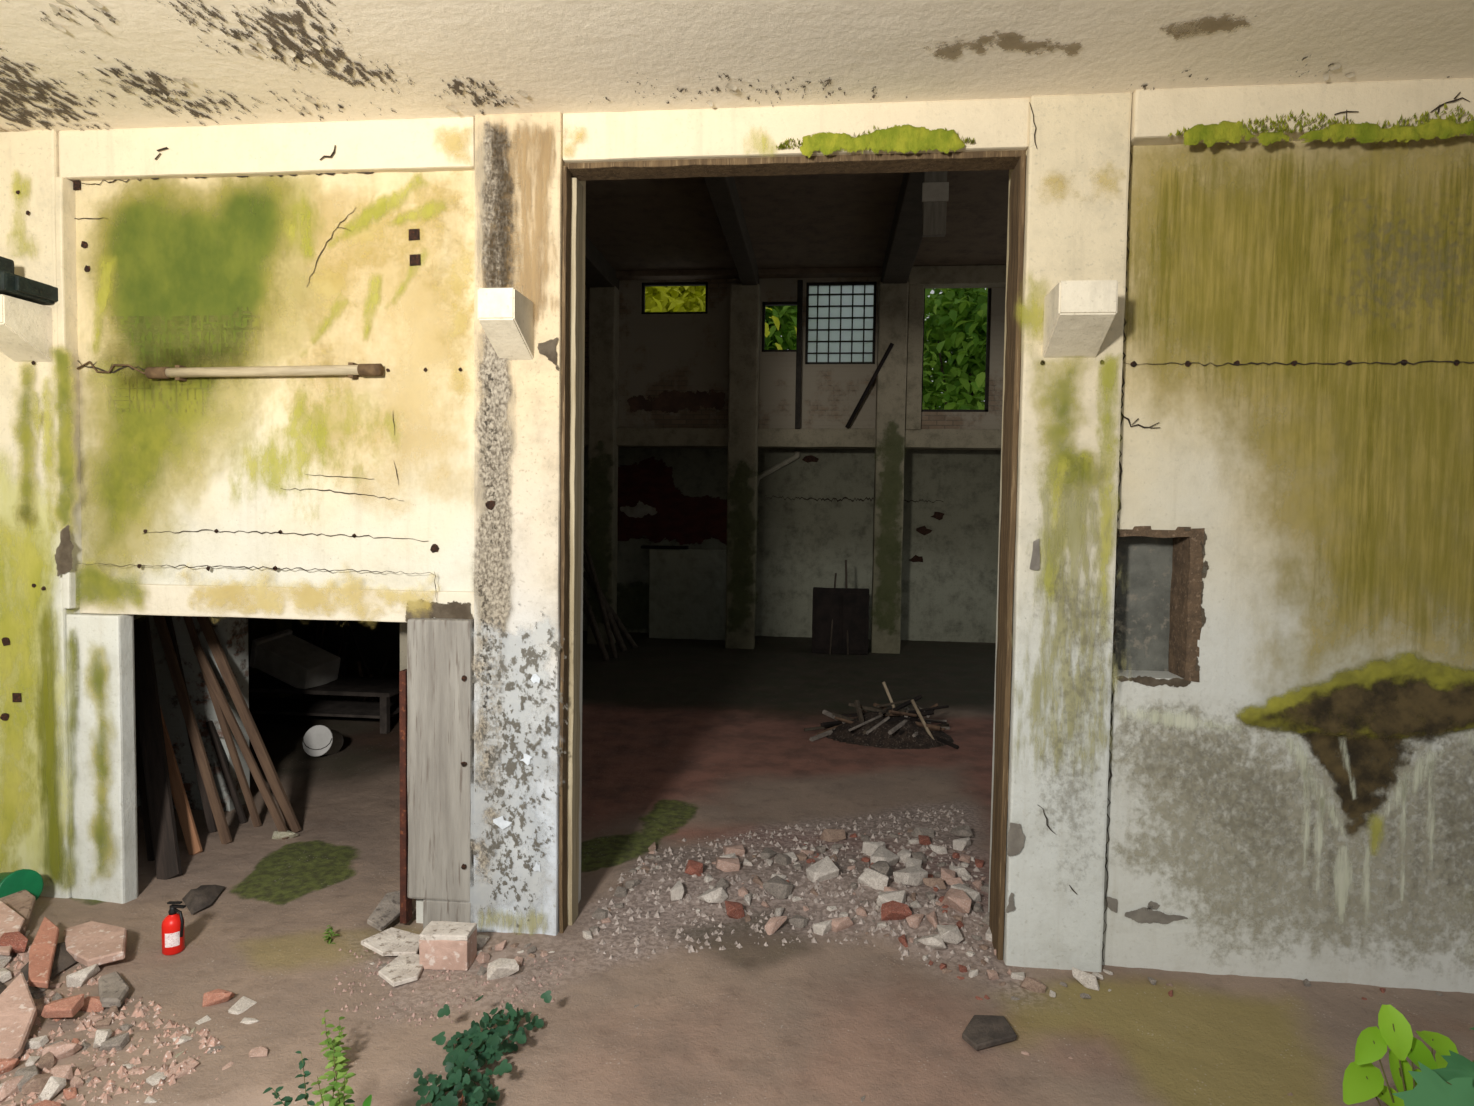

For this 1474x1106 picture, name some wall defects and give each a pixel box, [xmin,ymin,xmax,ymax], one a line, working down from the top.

spalling [434,76,529,288]
water stain [94,246,114,349]
water stain [99,126,555,481]
water stain [0,464,67,883]
water stain [34,390,53,480]
water stain [90,499,150,558]
peeling [405,333,576,935]
peeling [618,457,727,545]
water stain [1017,357,1474,953]